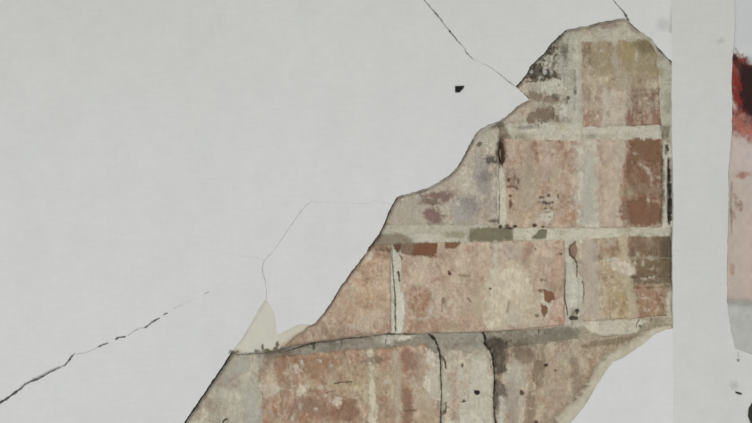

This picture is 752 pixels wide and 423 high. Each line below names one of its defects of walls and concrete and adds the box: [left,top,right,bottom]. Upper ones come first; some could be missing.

crack [0,353,75,404]
crack [288,197,447,423]
spalling [184,18,673,423]